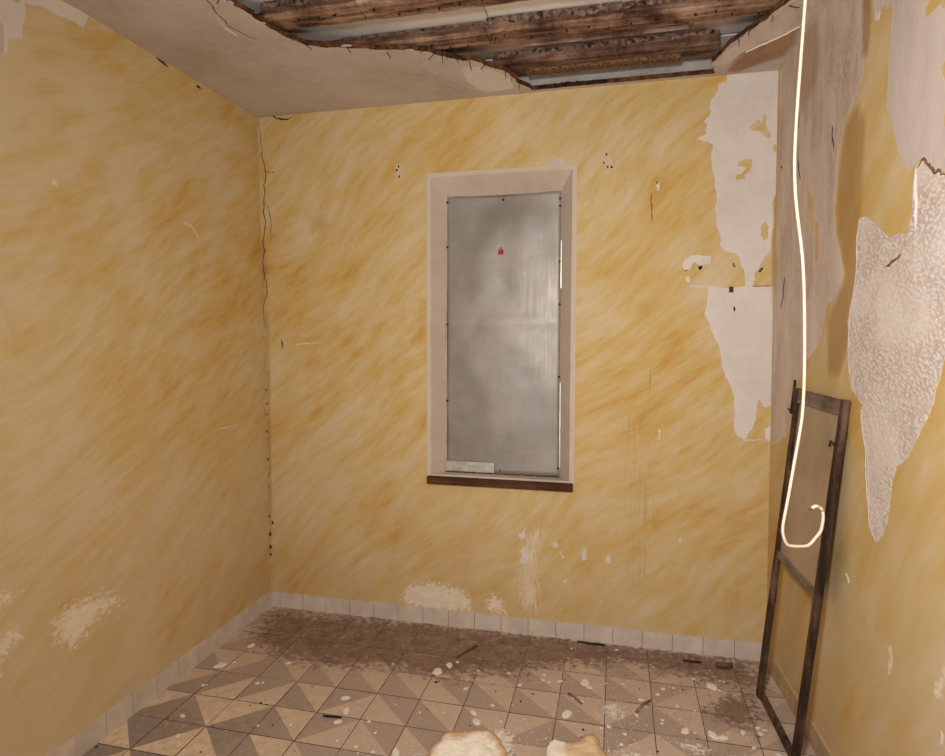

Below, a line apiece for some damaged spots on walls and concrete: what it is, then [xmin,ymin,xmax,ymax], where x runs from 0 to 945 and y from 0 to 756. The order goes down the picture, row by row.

peeling [0,0,89,55]
flaking render [218,0,519,92]
flaking render [540,79,607,89]
peeling [683,0,945,543]
peeling [394,512,567,620]